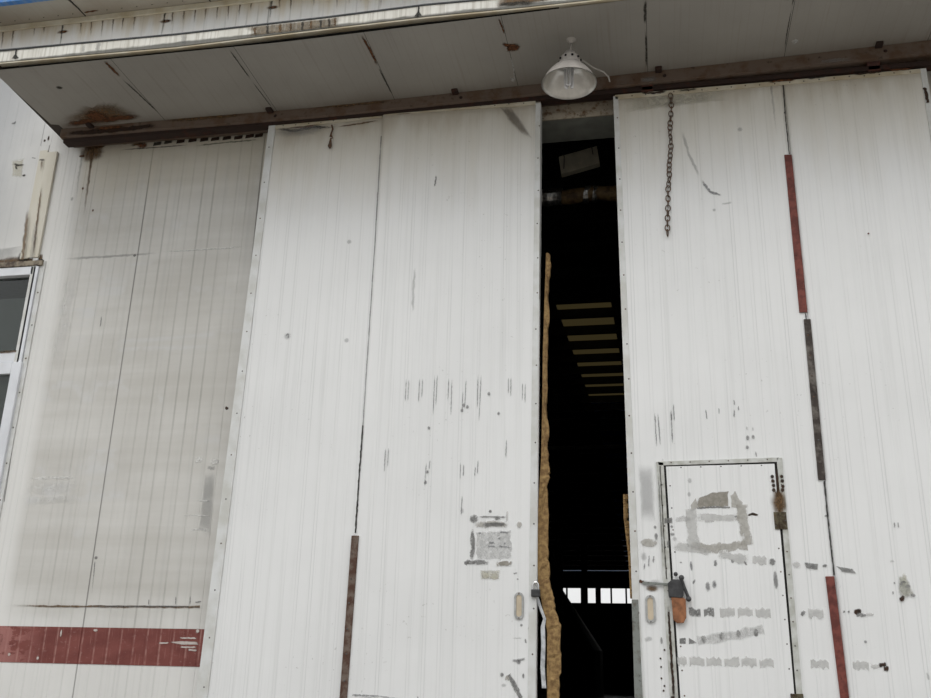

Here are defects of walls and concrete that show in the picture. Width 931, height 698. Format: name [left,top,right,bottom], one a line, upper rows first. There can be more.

corrosion [69,106,152,135]
corrosion [83,146,104,190]
peeling [464,510,522,566]
peeling [678,491,775,565]
peeling [689,607,771,618]
peeling [677,657,774,667]